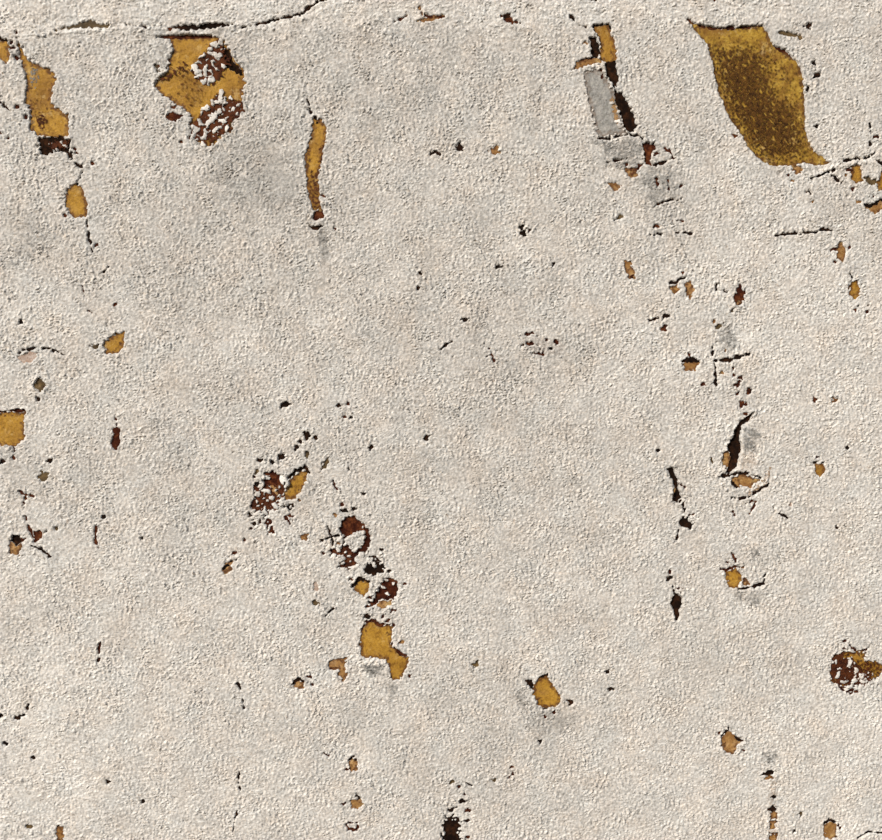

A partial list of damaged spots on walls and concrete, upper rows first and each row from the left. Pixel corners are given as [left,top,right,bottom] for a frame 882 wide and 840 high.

crack [55,20,147,32]
crack [172,0,326,31]
peeling [0,31,98,252]
peeling [154,27,247,147]
peeling [304,99,336,230]
peeling [687,19,829,182]
peeling [0,408,26,464]
peeling [243,431,318,541]
crack [701,319,771,500]
peeling [320,502,411,681]
peeling [525,673,573,718]
peeling [830,639,882,695]